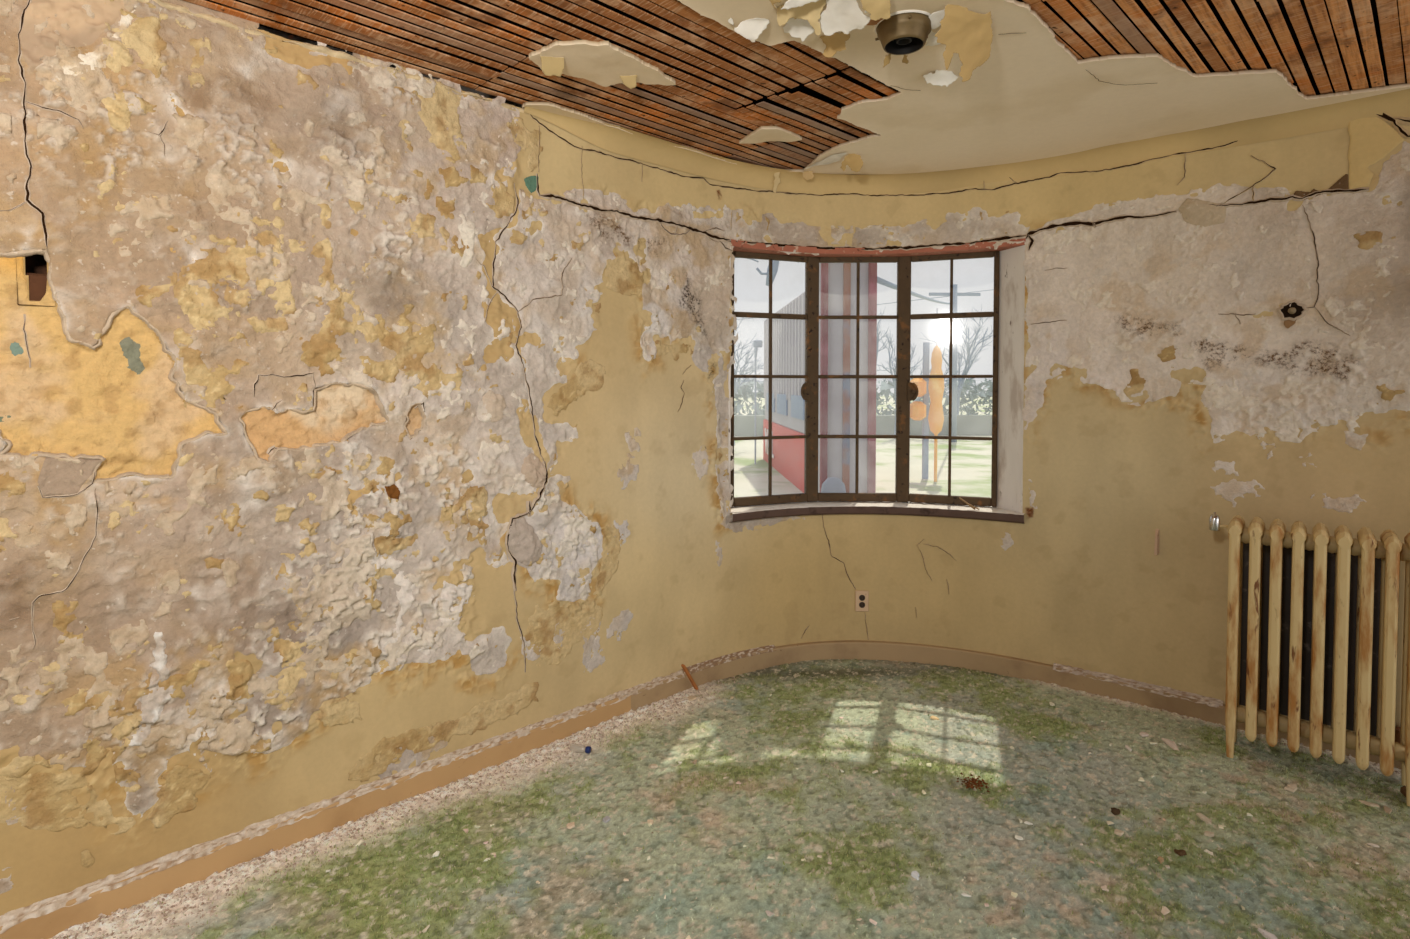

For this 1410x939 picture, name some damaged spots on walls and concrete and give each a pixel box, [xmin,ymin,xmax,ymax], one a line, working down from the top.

crack [22,314,31,367]
crack [0,0,84,250]
leakage [34,0,140,120]
leakage [108,75,345,354]
leakage [273,111,420,225]
leakage [345,50,436,99]
peeling [0,0,828,835]
peeling [728,0,891,58]
crack [476,114,1369,672]
peeling [923,4,993,87]
peeling [831,141,1410,443]
leakage [0,445,495,770]